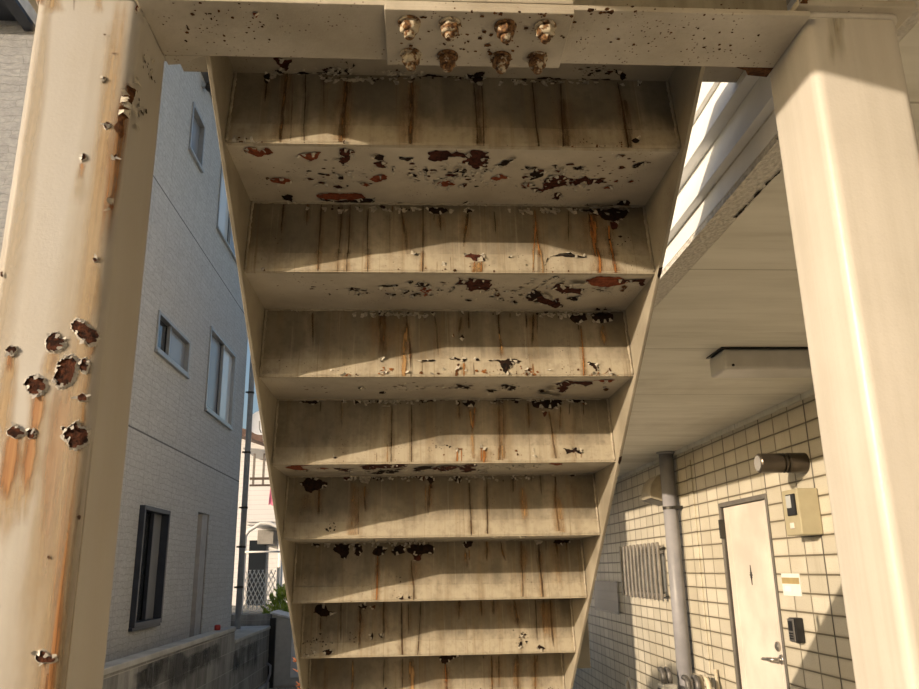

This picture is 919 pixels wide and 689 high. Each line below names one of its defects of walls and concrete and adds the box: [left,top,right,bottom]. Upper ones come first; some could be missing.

peeling [114,54,155,138]
peeling [232,135,651,245]
peeling [463,253,485,267]
rust [588,212,617,273]
peeling [311,261,646,325]
peeling [353,356,618,417]
peeling [311,538,435,561]
peeling [314,603,337,617]
rust [401,561,421,689]
rust [535,544,554,643]
peeling [293,633,333,689]
peeling [439,655,460,664]